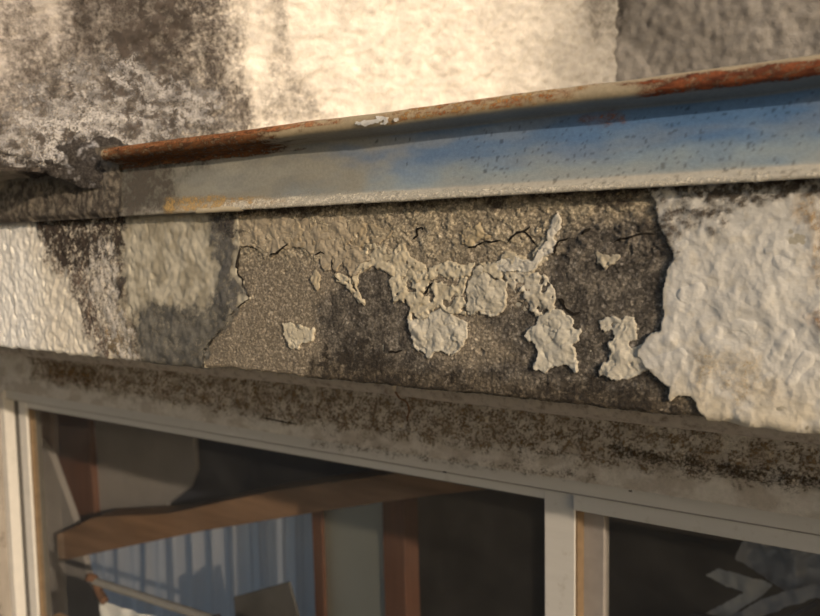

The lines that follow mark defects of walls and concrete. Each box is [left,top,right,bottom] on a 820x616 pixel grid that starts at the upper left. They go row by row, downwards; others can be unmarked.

damp [0,0,251,178]
rust [101,118,337,170]
rust [390,89,555,124]
rust [623,59,820,97]
crack [202,243,289,367]
damp [27,213,820,491]
peeling [195,172,768,417]